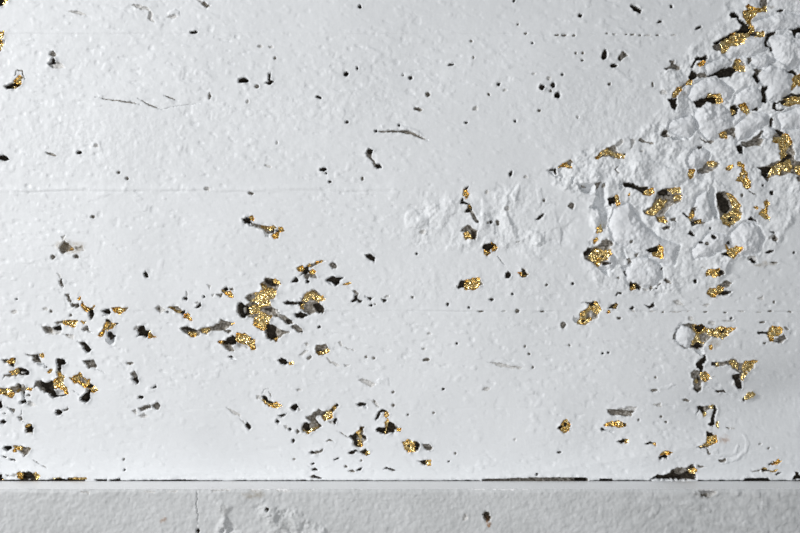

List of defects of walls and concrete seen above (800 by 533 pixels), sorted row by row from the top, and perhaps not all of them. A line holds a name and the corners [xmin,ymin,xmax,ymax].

flaking render [583,12,800,291]
peeling [567,160,605,196]
spalling [41,274,85,346]
peeling [181,319,231,336]
peeling [237,294,302,338]
flaking render [662,300,717,350]
peeling [0,371,64,421]
peeling [132,396,161,418]
peeling [302,409,333,430]
peeling [299,342,349,367]
peeling [691,370,703,390]
peeling [713,359,754,385]